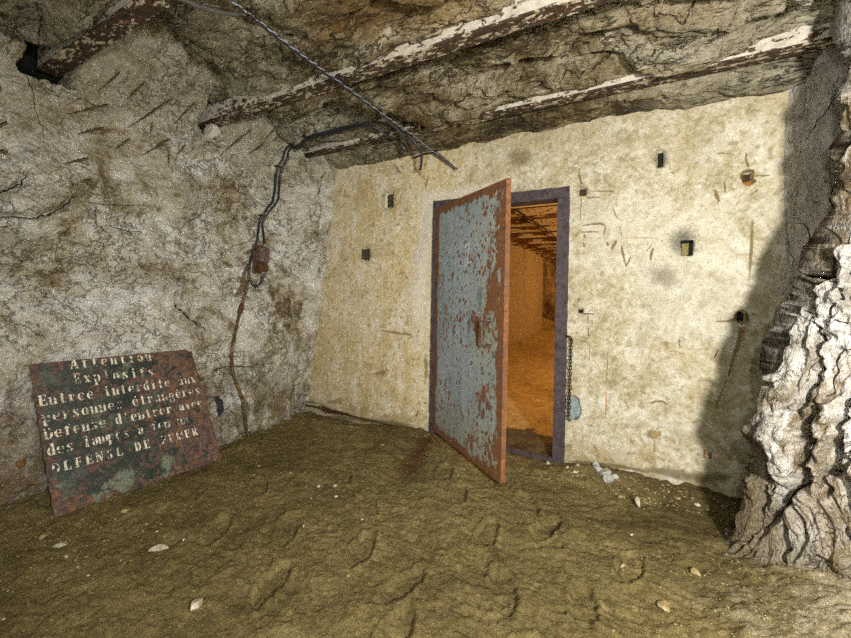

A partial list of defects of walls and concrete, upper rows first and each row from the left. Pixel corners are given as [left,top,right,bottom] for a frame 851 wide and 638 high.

crack [0,172,27,193]
crack [0,190,78,220]
crack [174,278,211,331]